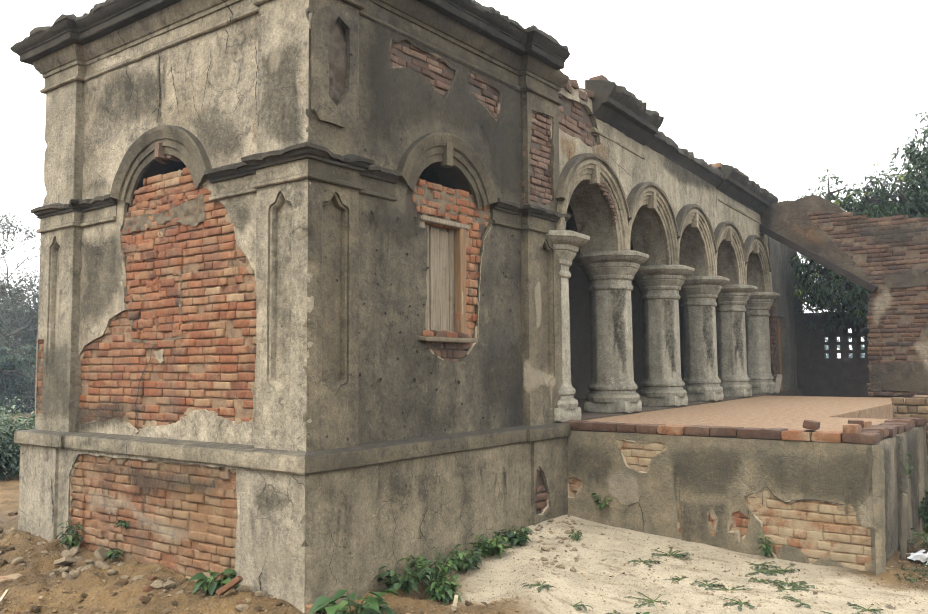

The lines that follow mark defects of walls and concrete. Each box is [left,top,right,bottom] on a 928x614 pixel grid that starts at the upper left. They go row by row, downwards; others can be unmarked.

spalling [389,39,454,96]
spalling [468,72,500,122]
spalling [520,94,598,206]
spalling [79,155,257,434]
spalling [416,220,484,363]
spalling [68,454,238,582]
spalling [535,467,549,515]
spalling [615,433,667,474]
spalling [705,488,872,571]